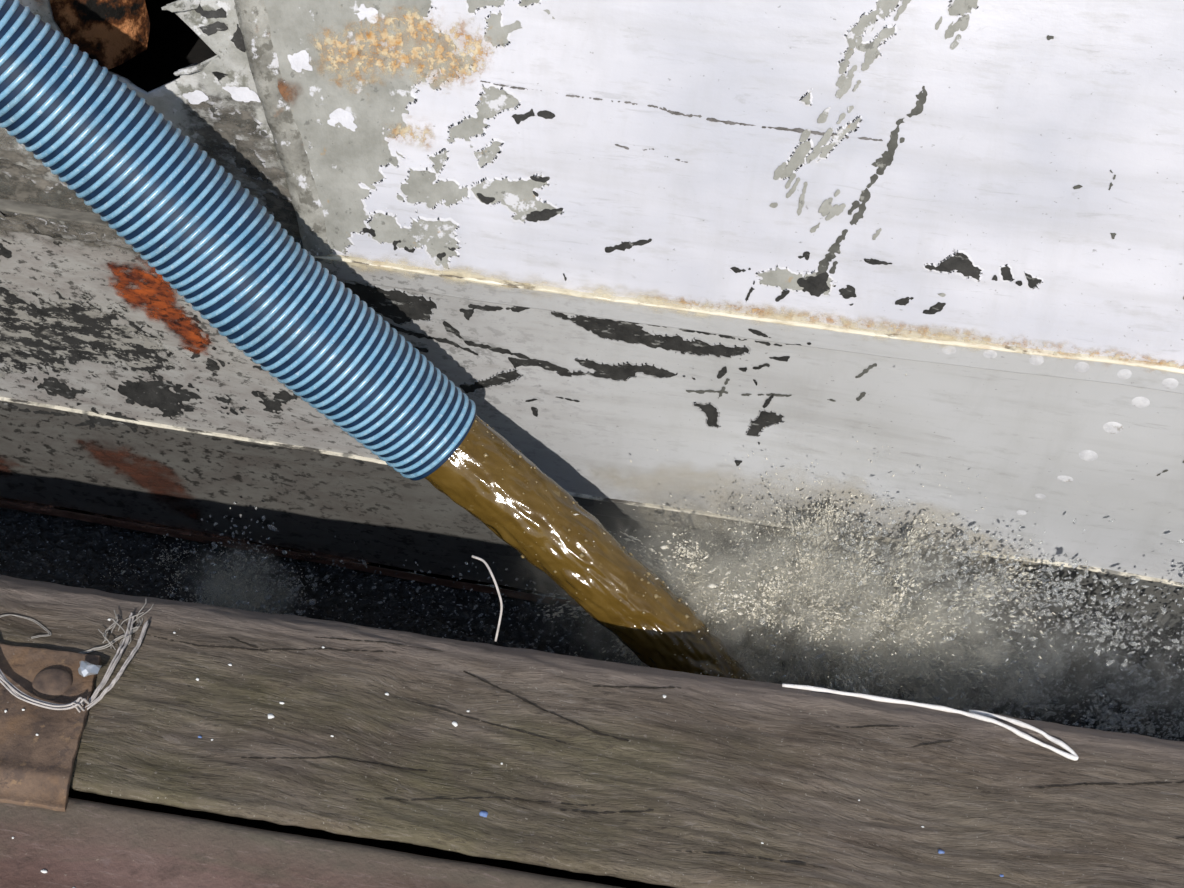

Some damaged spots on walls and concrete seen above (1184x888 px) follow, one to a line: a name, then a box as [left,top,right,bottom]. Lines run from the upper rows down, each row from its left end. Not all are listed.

peeling [194,4,246,52]
rust [314,11,490,85]
peeling [182,71,304,249]
rust [392,125,430,142]
peeling [264,0,564,270]
peeling [769,0,911,216]
rust [107,259,207,353]
peeling [730,251,857,306]
peeling [923,293,946,314]
peeling [923,250,1044,290]
peeling [0,280,297,434]
peeling [340,280,811,444]